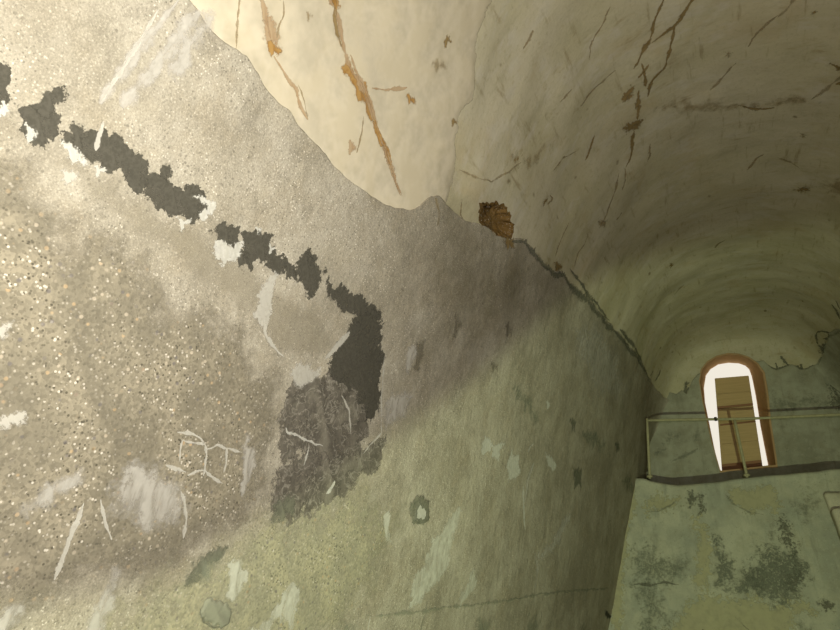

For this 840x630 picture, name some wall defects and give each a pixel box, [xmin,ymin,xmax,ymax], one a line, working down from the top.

rust [260,0,308,120]
flaking render [190,0,492,210]
rust [328,0,415,196]
crack [553,135,595,171]
crack [561,0,694,267]
spalling [478,201,515,239]
spalling [0,167,276,628]
flaking render [410,495,430,525]
mould [714,517,811,608]